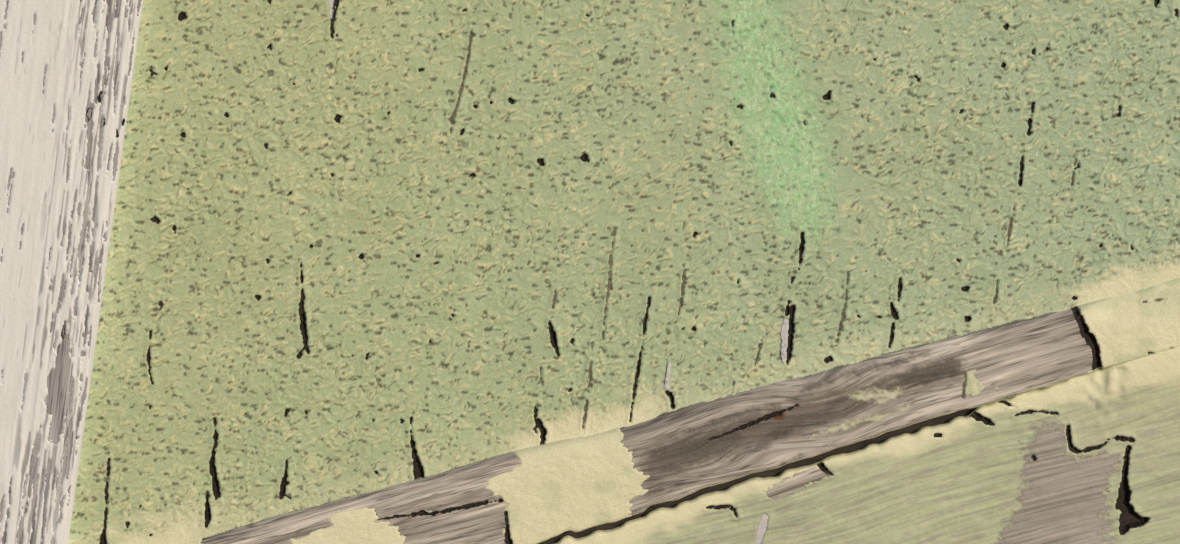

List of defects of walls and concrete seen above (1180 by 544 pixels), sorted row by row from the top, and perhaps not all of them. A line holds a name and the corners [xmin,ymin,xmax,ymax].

peeling [0,0,143,544]
crack [205,417,221,528]
crack [297,262,310,359]
peeling [201,452,520,544]
crack [533,290,560,445]
crack [629,297,675,422]
crack [378,373,1135,544]
peeling [754,514,769,544]
crack [731,232,805,393]
peeling [620,296,1093,516]
peeling [996,420,1150,544]
crack [1072,306,1102,371]